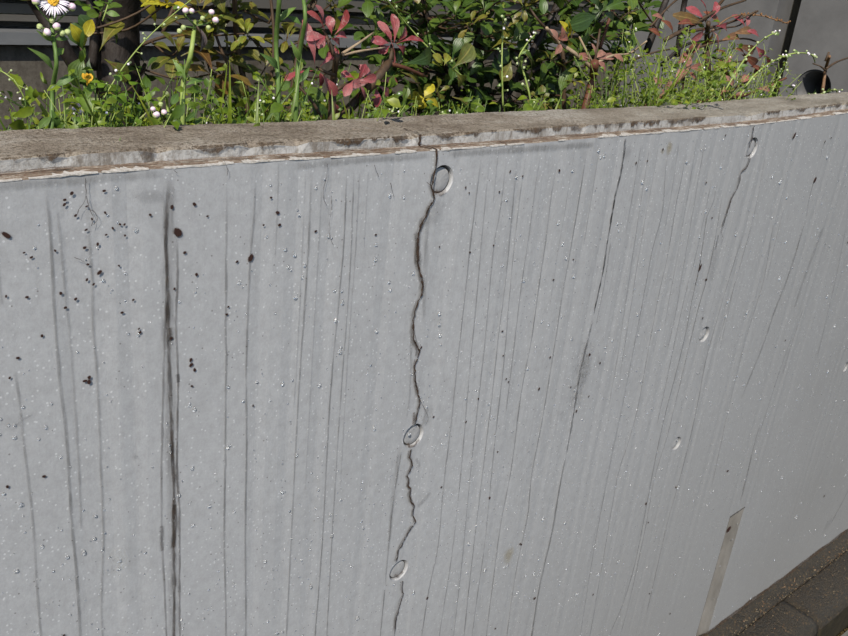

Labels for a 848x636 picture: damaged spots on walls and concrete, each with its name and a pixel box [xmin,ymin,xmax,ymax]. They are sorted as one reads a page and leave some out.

crack [404,128,438,424]
crack [394,449,416,636]